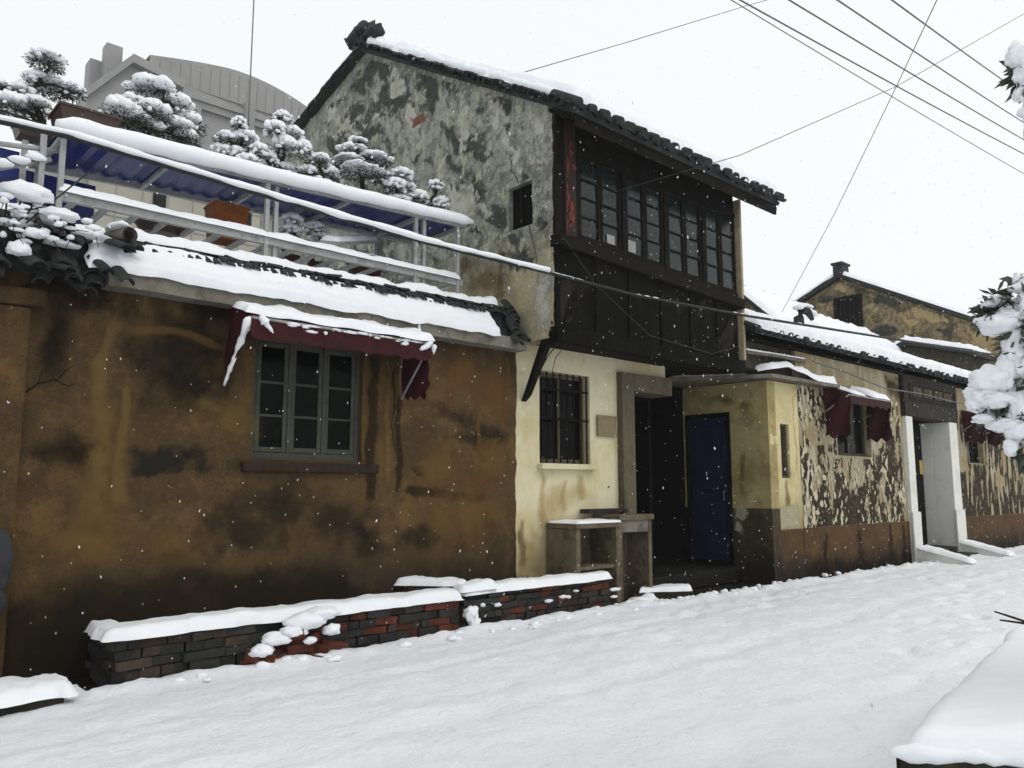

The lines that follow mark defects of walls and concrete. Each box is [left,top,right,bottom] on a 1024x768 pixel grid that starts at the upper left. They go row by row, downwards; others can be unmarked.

mould [327,59,534,272]
crack [26,366,73,393]
leakage [215,488,301,547]
leakage [383,376,403,489]
peeling [797,385,907,528]
peeling [957,410,1024,517]